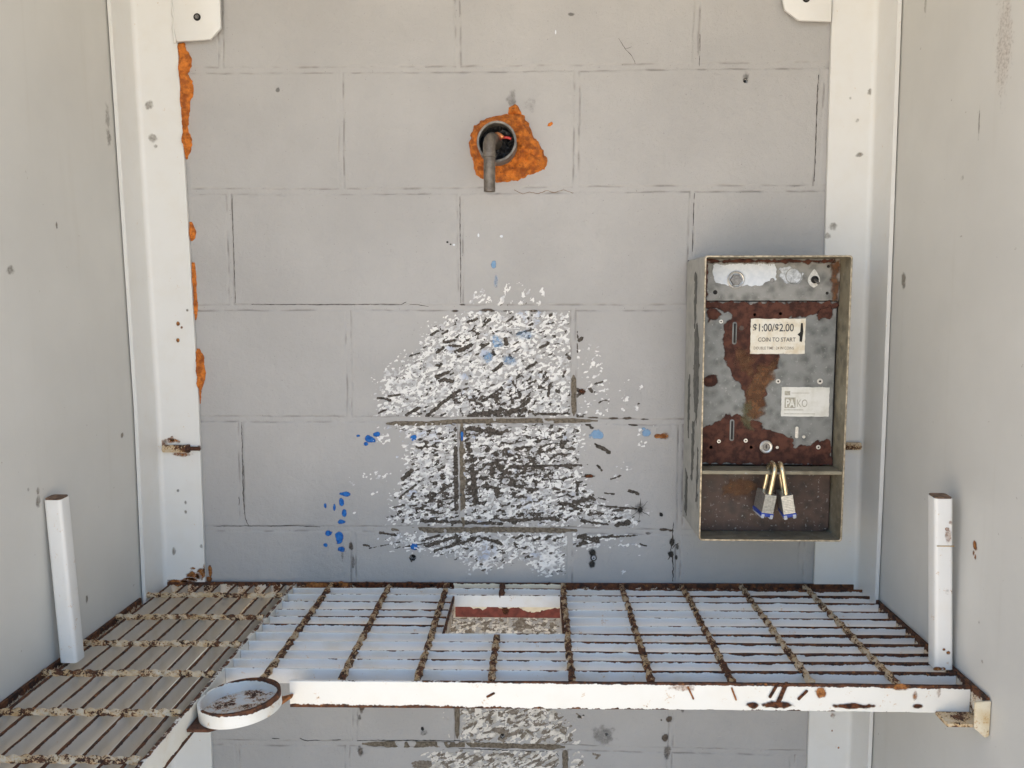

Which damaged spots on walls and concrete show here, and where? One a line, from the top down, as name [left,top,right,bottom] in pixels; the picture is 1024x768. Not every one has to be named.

peeling [349,282,679,577]